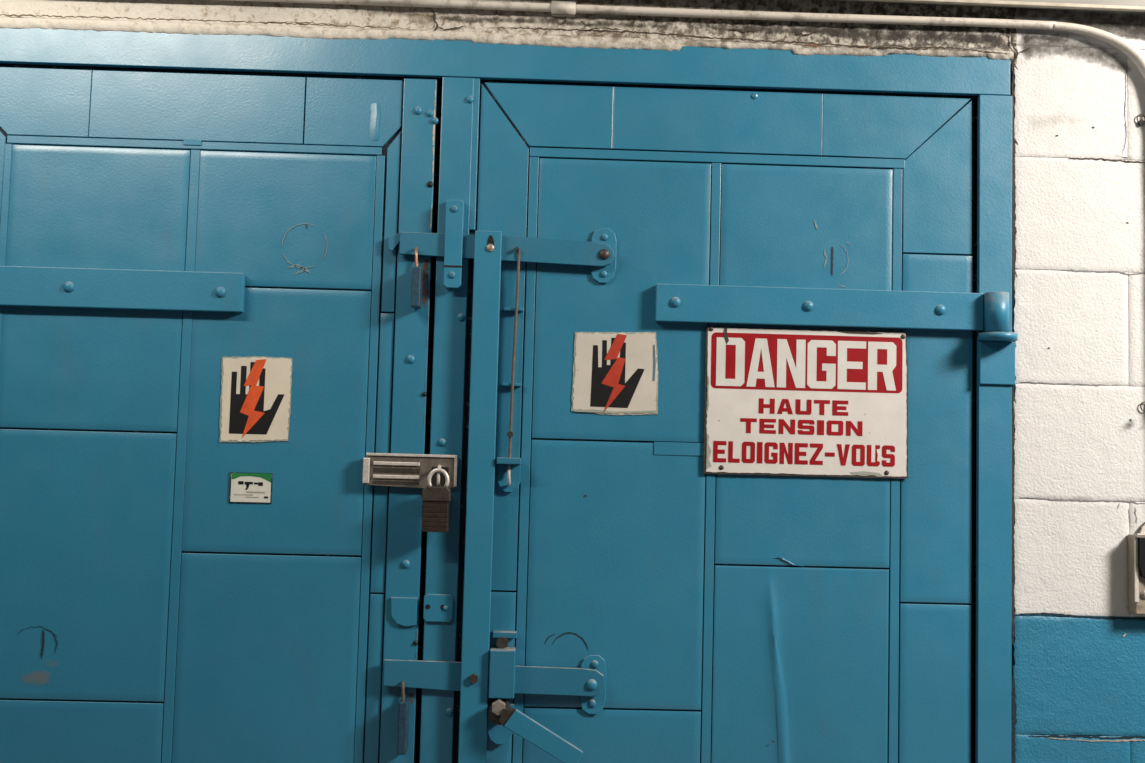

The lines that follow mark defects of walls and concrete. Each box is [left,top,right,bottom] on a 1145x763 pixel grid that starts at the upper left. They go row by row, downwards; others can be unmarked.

leakage [409,14,665,28]
leakage [689,24,1003,46]
leakage [1008,8,1145,40]
leakage [1023,34,1125,69]